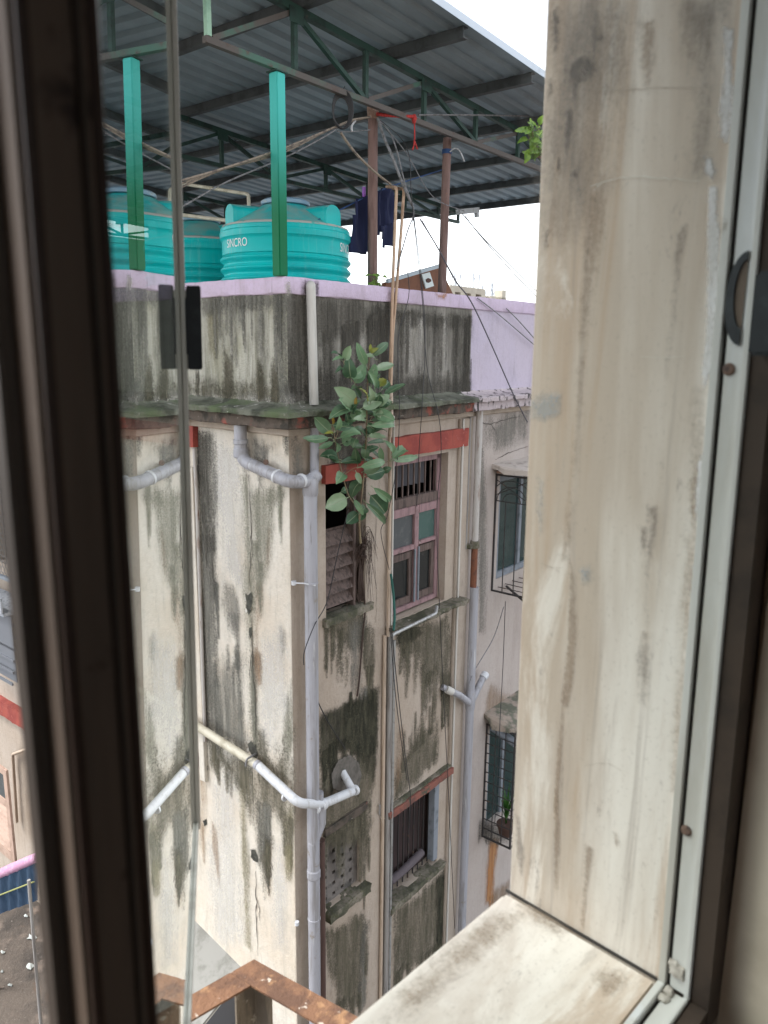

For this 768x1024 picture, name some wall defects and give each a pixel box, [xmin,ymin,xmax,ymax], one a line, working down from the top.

water stain [202,280,472,406]
water stain [197,431,284,944]
water stain [324,618,374,717]
water stain [396,636,447,783]
water stain [322,740,360,794]
crack [255,842,274,955]
water stain [262,811,293,902]
corrosion [486,841,509,904]
water stain [336,927,368,1014]
water stain [394,944,442,986]